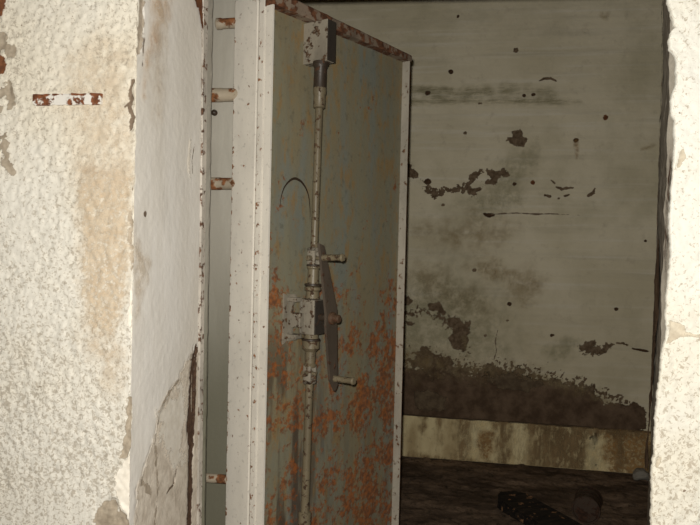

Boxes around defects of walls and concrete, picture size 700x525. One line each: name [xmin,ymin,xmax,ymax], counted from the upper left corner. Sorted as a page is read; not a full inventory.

flaking render [0,32,17,58]
flaking render [0,80,16,113]
flaking render [0,132,16,176]
peeling [506,130,527,147]
peeling [408,163,516,206]
damp [79,167,130,331]
peeling [402,238,659,471]
peeling [93,351,200,525]
damp [493,421,651,473]